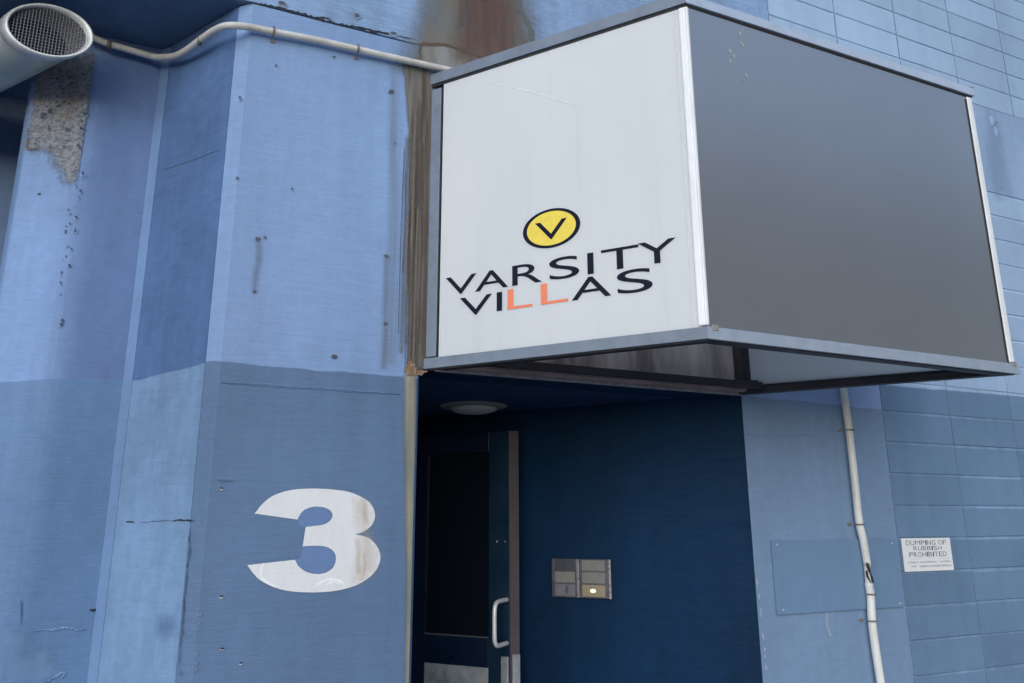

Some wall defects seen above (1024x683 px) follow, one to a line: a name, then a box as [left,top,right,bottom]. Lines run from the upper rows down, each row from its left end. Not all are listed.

crack [238,2,415,40]
spalling [25,54,95,183]
crack [127,519,193,676]